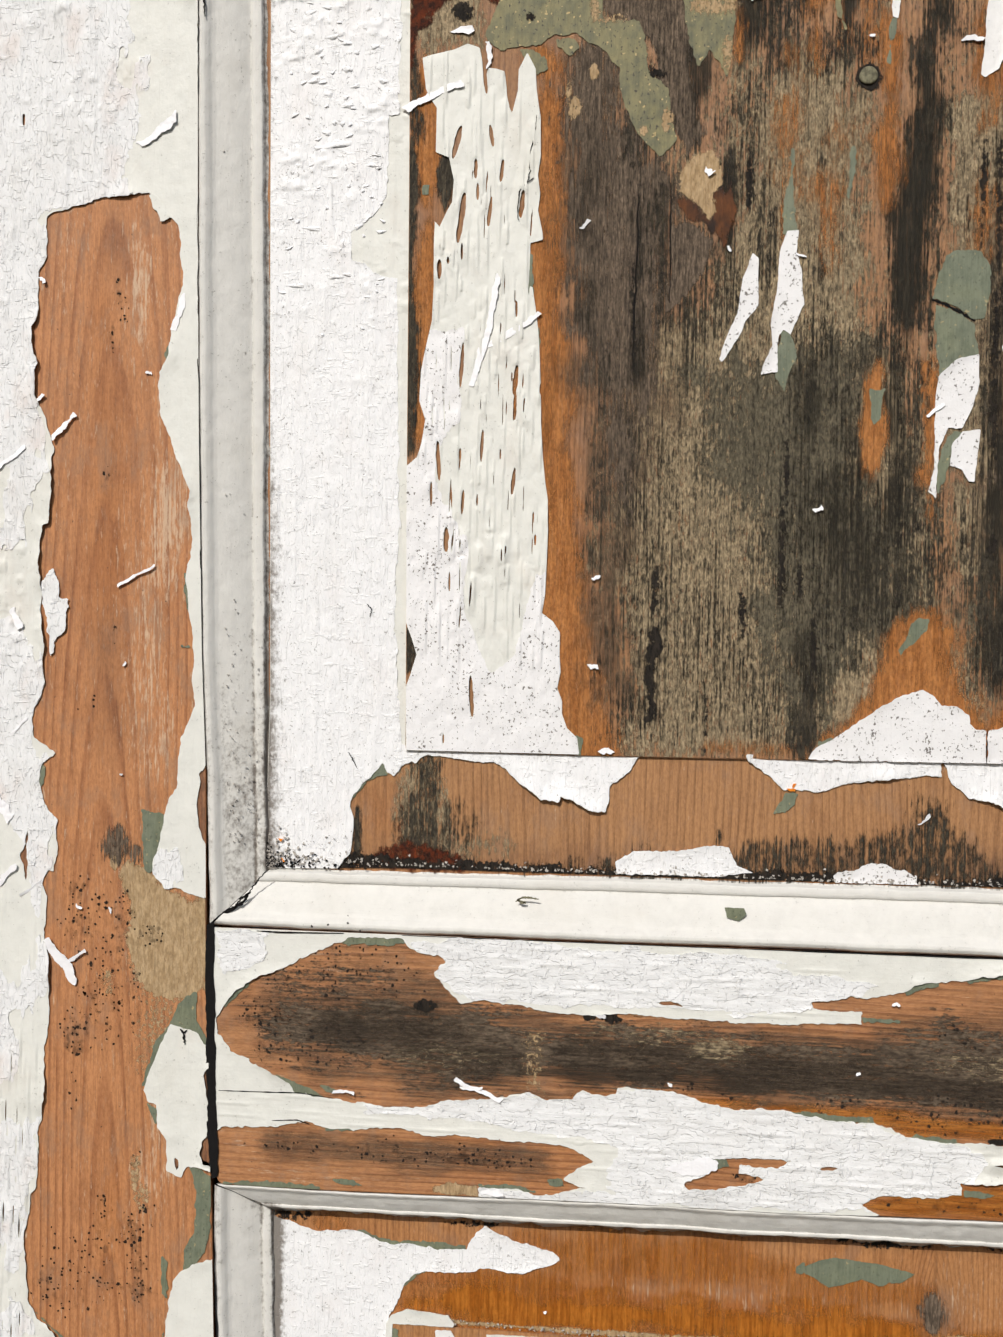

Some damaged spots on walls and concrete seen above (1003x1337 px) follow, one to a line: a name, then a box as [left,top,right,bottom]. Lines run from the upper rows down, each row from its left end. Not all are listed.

peeling [347,0,1003,886]
peeling [18,193,593,1337]
mould [352,806,362,856]
mould [393,755,480,861]
leakage [568,855,696,881]
peeling [725,907,746,921]
leakage [721,798,1003,891]
peeling [216,937,1003,1146]
leakage [238,915,1003,1140]
peeling [665,1157,788,1190]
peeling [863,1184,1003,1221]
peeling [274,1210,1003,1337]